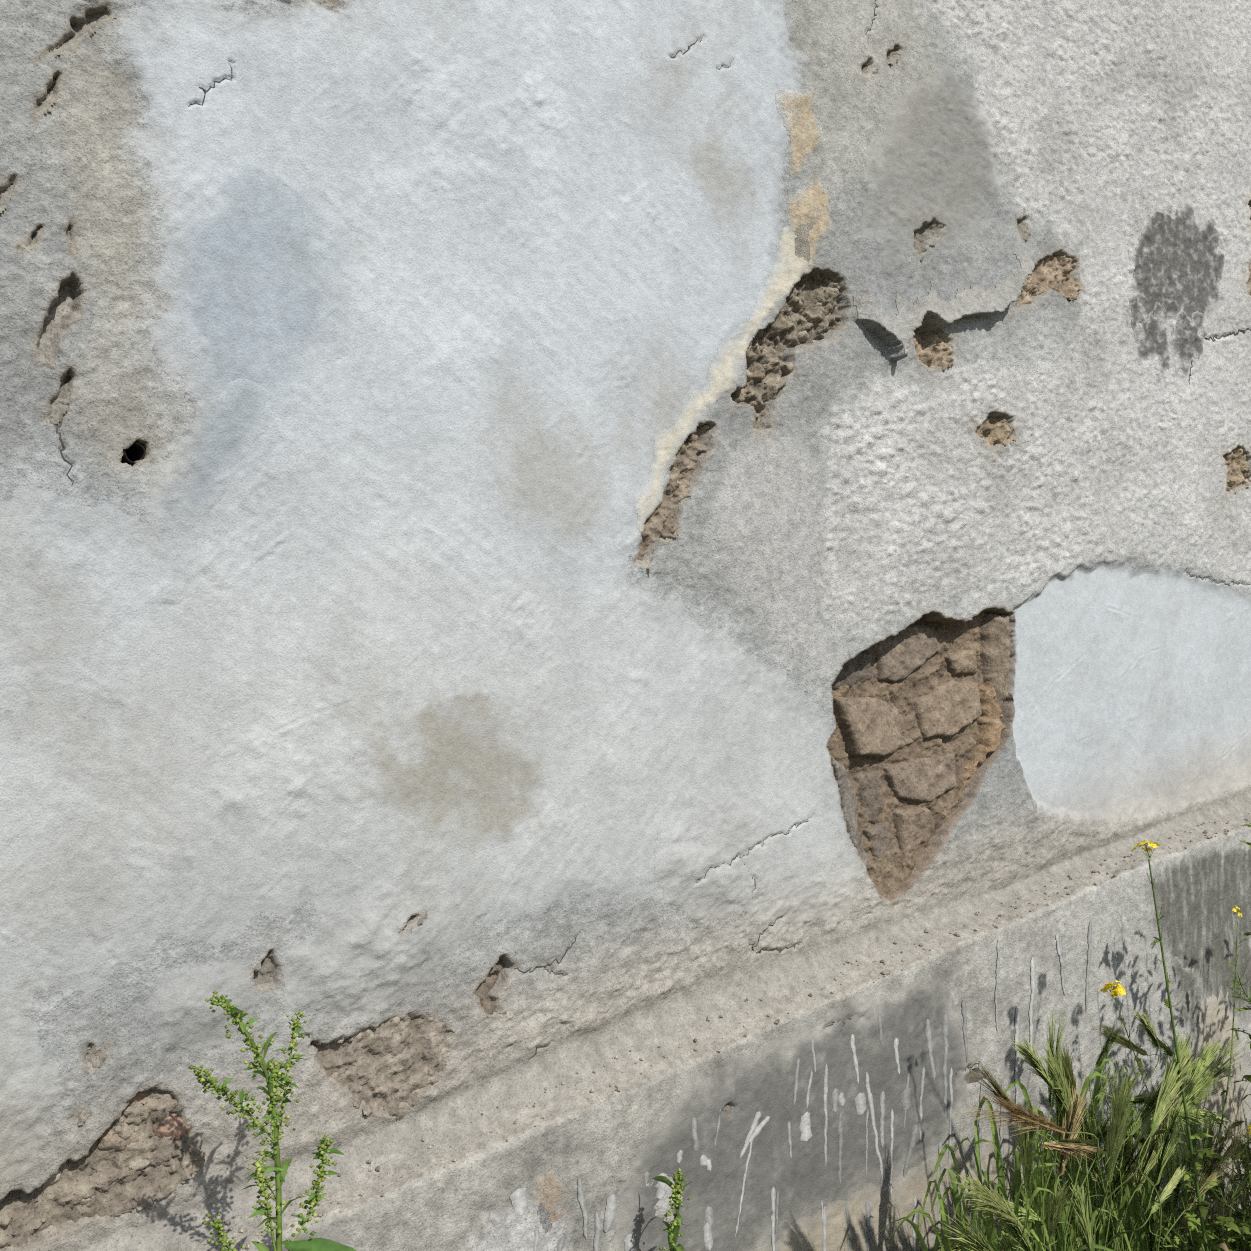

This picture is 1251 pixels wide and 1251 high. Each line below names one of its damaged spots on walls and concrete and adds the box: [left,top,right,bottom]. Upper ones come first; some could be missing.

peeling [731,221,1083,429]
damp [1129,293,1207,381]
flaking render [637,424,710,570]
flaking render [1223,448,1251,493]
spalling [827,612,1012,898]
flaking render [313,1013,457,1119]
flaking render [0,1089,206,1249]